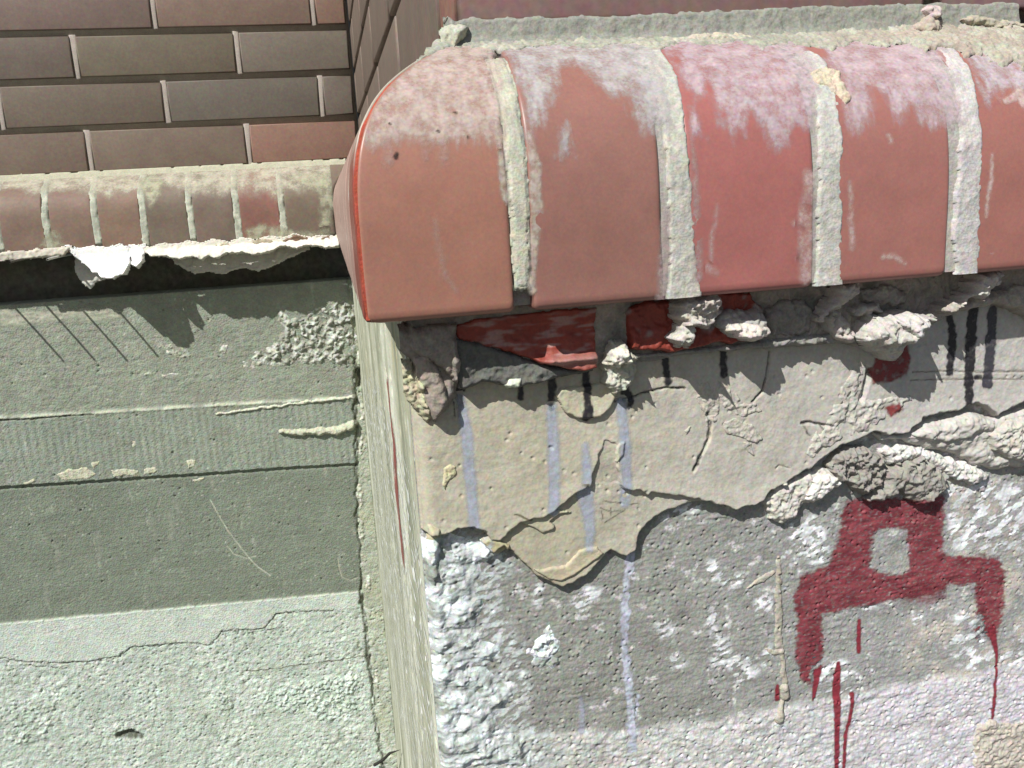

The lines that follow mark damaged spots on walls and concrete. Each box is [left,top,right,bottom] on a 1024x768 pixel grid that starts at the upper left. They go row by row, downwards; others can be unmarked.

water stain [825,41,962,130]
water stain [970,52,1024,107]
water stain [2,165,331,196]
water stain [366,37,817,293]
peeling [0,233,339,280]
spalling [158,344,191,359]
spalling [243,300,360,369]
spalling [359,434,367,455]
peeling [410,305,1024,587]
spalling [356,483,365,541]
spalling [360,554,371,593]